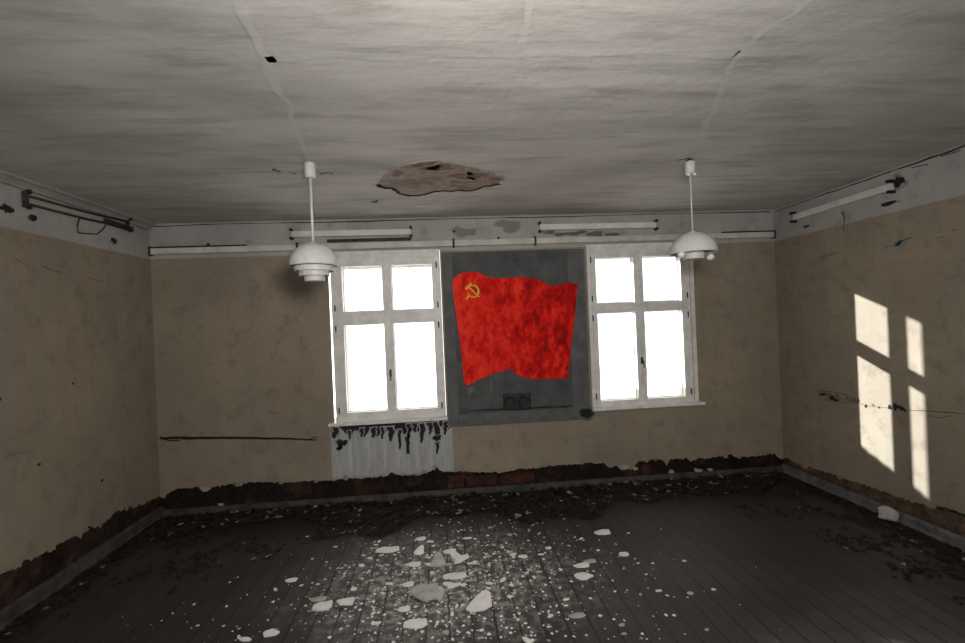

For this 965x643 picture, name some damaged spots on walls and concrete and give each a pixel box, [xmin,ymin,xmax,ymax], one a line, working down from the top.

flaking render [376,159,506,196]
crack [818,391,961,418]
crack [160,434,317,442]
flaking render [0,453,965,610]